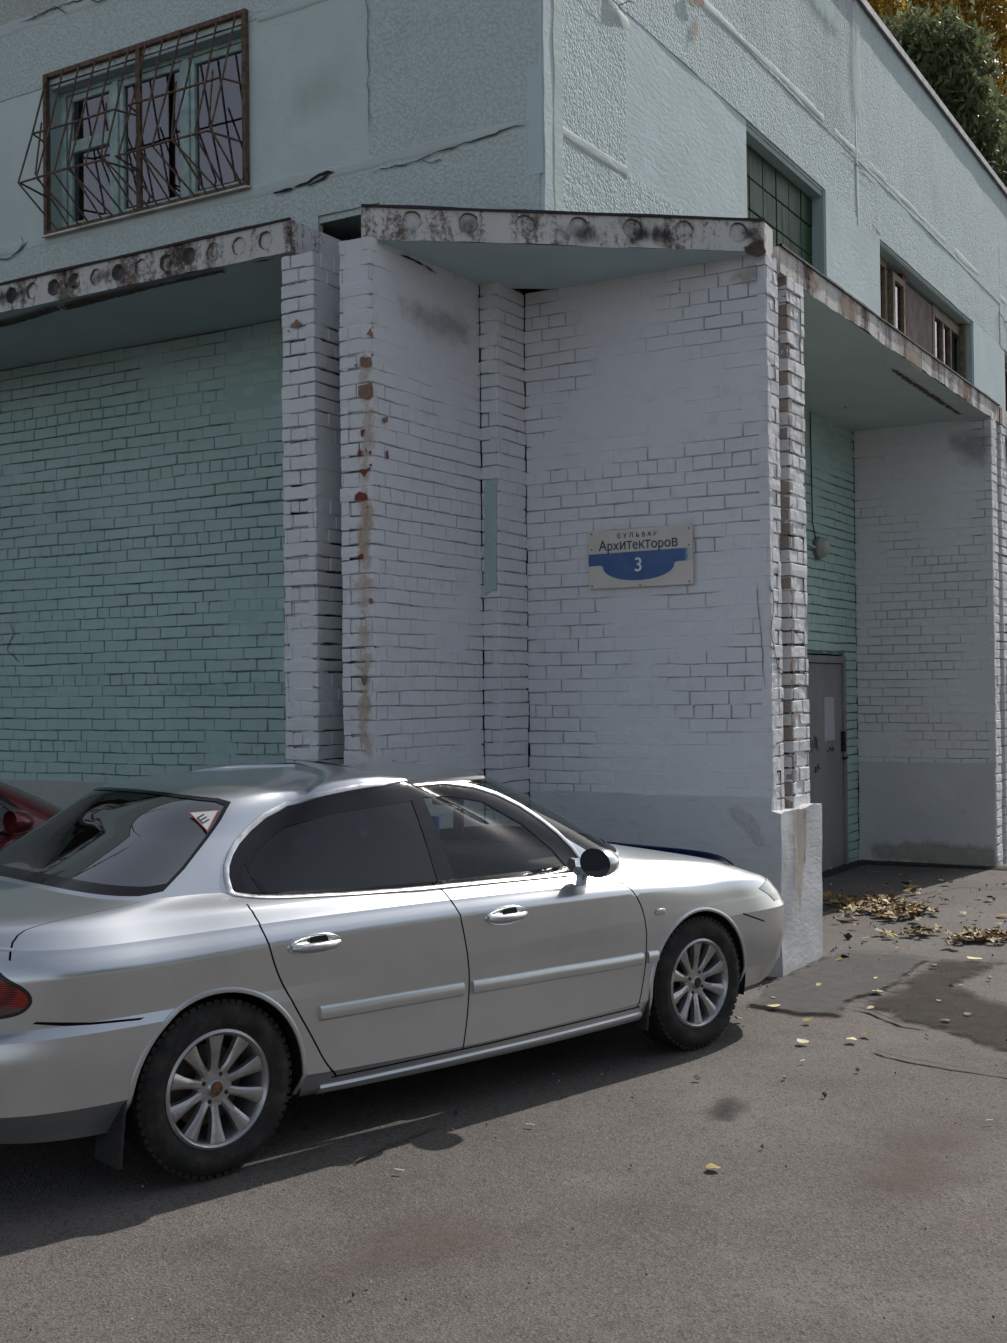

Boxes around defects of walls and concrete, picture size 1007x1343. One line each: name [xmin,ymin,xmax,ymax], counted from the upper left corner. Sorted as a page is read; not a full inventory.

spalling [744,240,766,257]
spalling [0,269,225,327]
spalling [892,369,961,415]